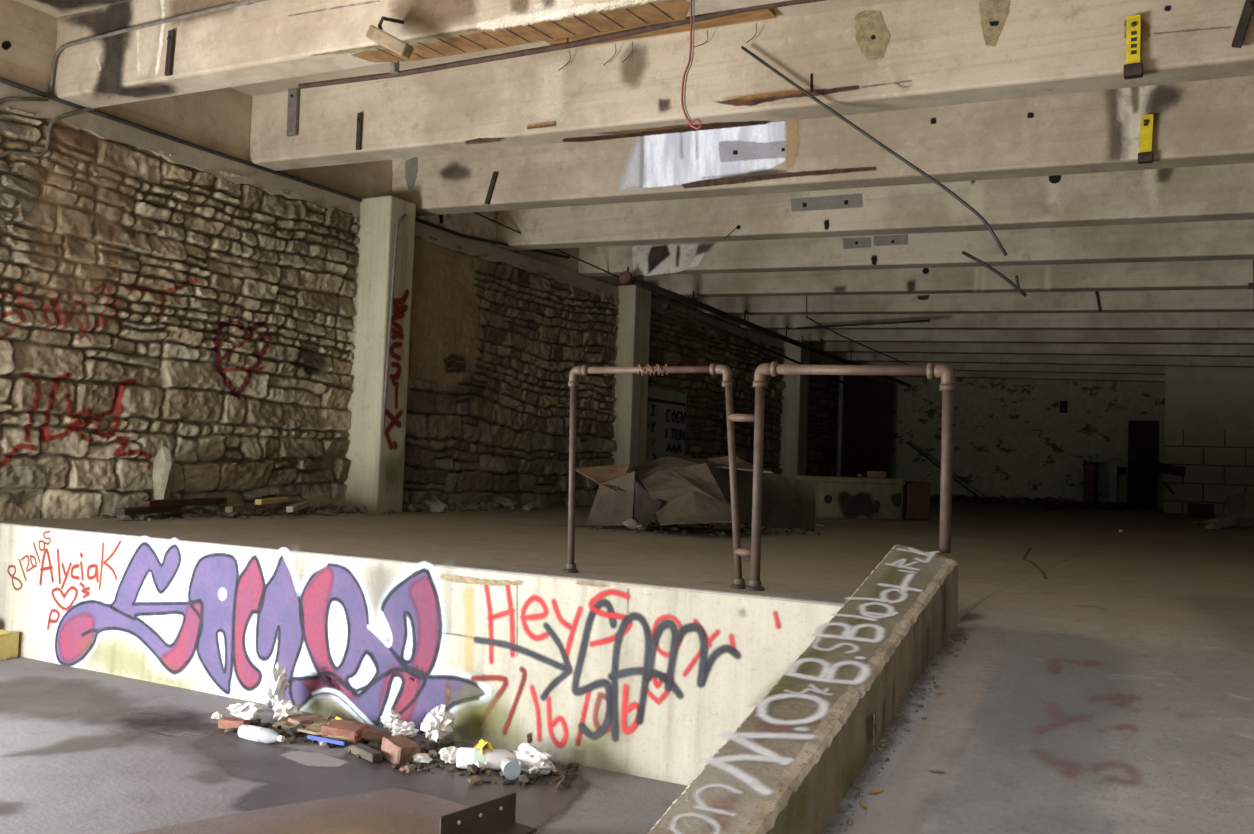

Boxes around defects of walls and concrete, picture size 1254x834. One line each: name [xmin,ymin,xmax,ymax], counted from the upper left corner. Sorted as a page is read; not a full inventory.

water stain [69,0,234,98]
spalling [302,0,690,62]
water stain [394,0,656,31]
spalling [854,10,891,60]
spalling [978,0,1010,47]
water stain [1108,89,1122,158]
water stain [1149,85,1179,117]